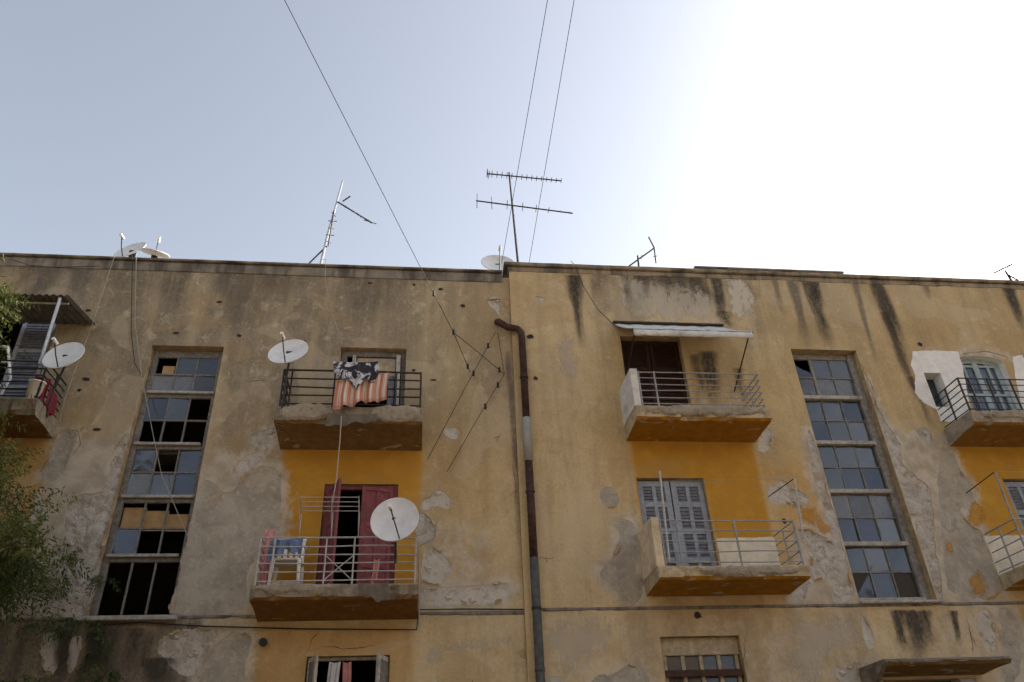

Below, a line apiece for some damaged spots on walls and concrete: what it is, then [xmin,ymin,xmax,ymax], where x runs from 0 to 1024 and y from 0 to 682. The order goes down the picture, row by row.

leakage [569,276,580,329]
leakage [666,276,729,323]
leakage [789,281,826,330]
leakage [871,279,909,374]
leakage [1006,284,1021,316]
flaking render [38,433,129,617]
flaking render [157,403,335,677]
flaking render [415,490,510,606]
flaking render [700,428,854,604]
flaking render [866,378,1024,682]
flaking render [39,632,82,676]
leakage [893,610,928,647]